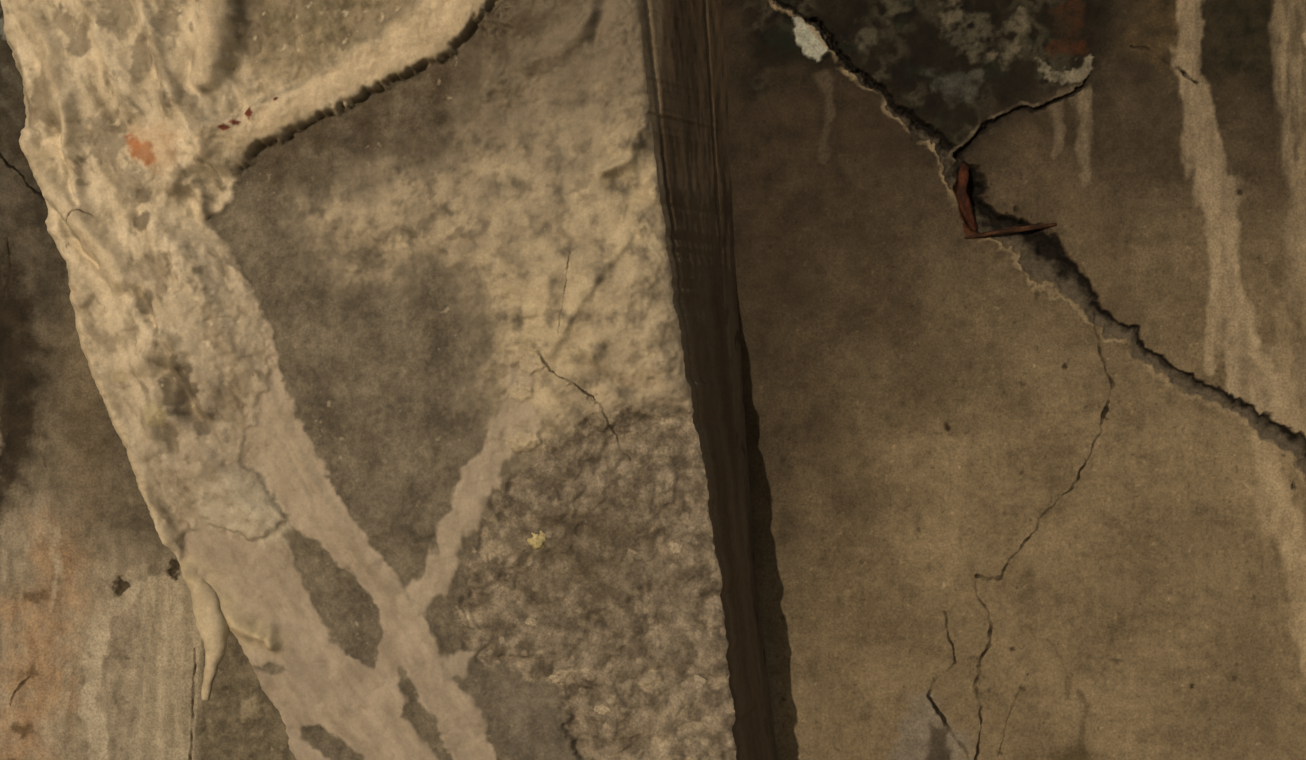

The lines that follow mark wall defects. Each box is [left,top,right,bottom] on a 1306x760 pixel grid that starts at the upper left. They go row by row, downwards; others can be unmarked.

crack [0,147,101,229]
damp [263,0,693,487]
damp [723,0,1152,324]
rust [956,163,978,231]
damp [1168,0,1306,421]
crack [756,0,1306,760]
damp [47,522,67,613]
damp [186,457,296,553]
damp [1243,436,1306,688]
damp [56,577,140,760]
damp [881,683,976,760]
damp [1017,621,1099,760]